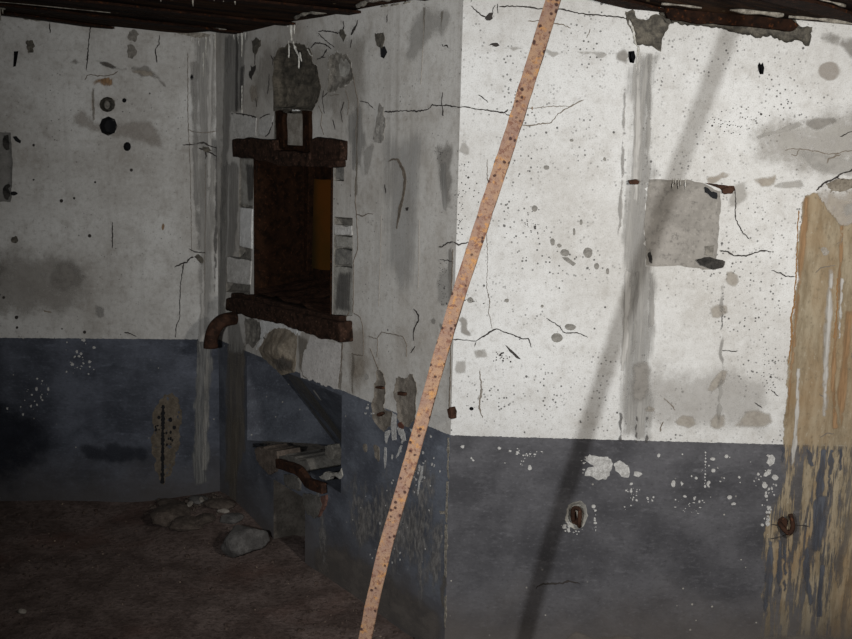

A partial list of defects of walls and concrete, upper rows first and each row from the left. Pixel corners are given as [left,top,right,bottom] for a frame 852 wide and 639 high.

spalling [625,8,812,52]
spalling [272,43,353,114]
crack [785,131,852,191]
water stain [175,28,274,502]
crack [318,76,583,407]
water stain [617,20,656,443]
peeling [644,179,735,270]
flaking render [244,318,342,389]
spalling [363,370,417,469]
crack [476,371,484,418]
corrosion [761,193,852,628]
peeling [581,454,654,510]